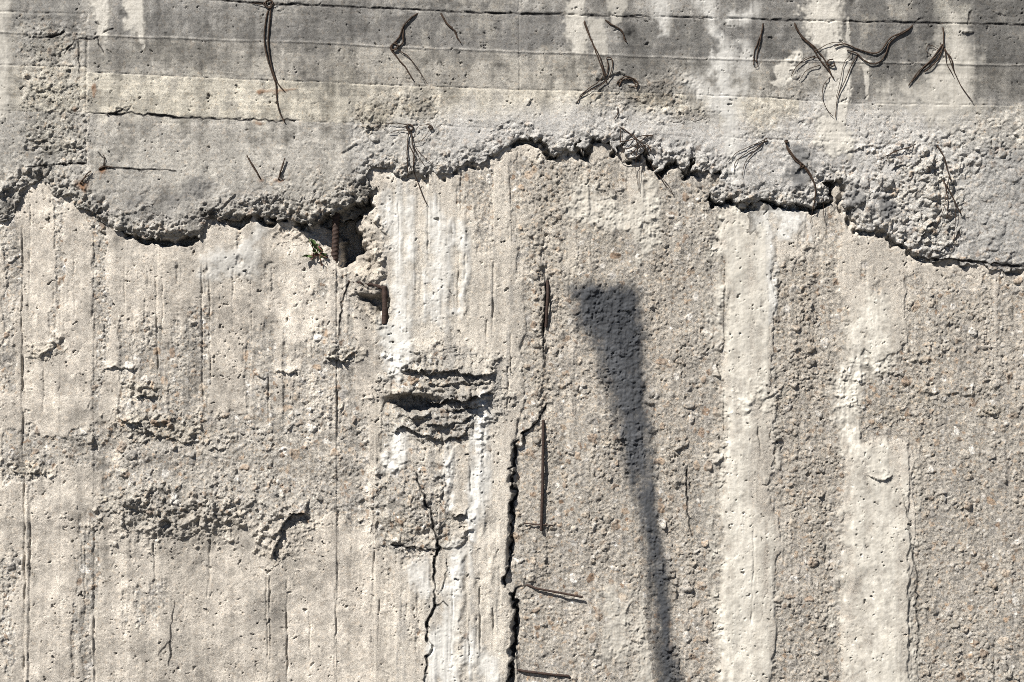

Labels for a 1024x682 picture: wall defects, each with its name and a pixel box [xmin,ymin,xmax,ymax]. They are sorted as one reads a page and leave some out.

damp [88,0,109,39]
damp [122,0,145,49]
damp [562,0,627,55]
damp [692,0,751,177]
damp [770,49,803,88]
damp [784,0,984,189]
spalling [0,22,829,330]
spalling [843,141,966,256]
crack [540,274,548,359]
spalling [317,341,526,453]
crack [390,472,448,682]
crack [502,402,554,682]